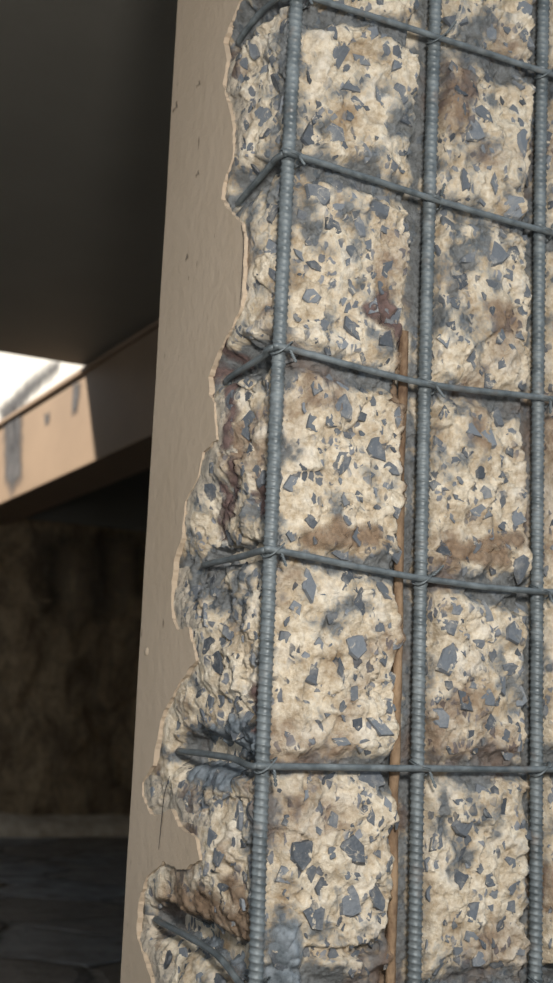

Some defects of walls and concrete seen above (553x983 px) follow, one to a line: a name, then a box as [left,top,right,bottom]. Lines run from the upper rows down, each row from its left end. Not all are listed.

spalling [225,6,290,346]
corrosion [213,340,254,539]
corrosion [252,485,266,514]
spalling [263,0,553,983]
spalling [140,359,271,983]